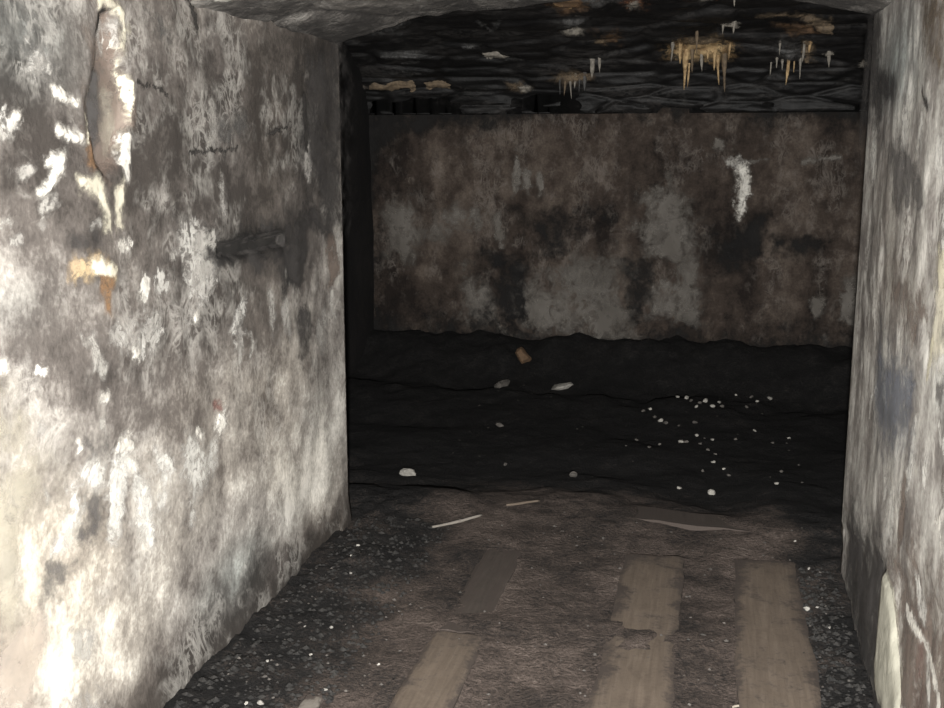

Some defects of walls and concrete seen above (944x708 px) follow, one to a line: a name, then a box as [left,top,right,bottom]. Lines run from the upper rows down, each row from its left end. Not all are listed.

leakage [557,57,601,99]
leakage [559,0,624,36]
leakage [667,21,739,92]
leakage [757,13,834,83]
leakage [0,106,21,140]
flaking render [19,165,34,179]
flaking render [36,152,66,219]
spalling [50,0,135,231]
crack [189,145,238,155]
leakage [712,138,772,274]
corrosion [70,231,118,313]
flaking render [846,507,944,708]